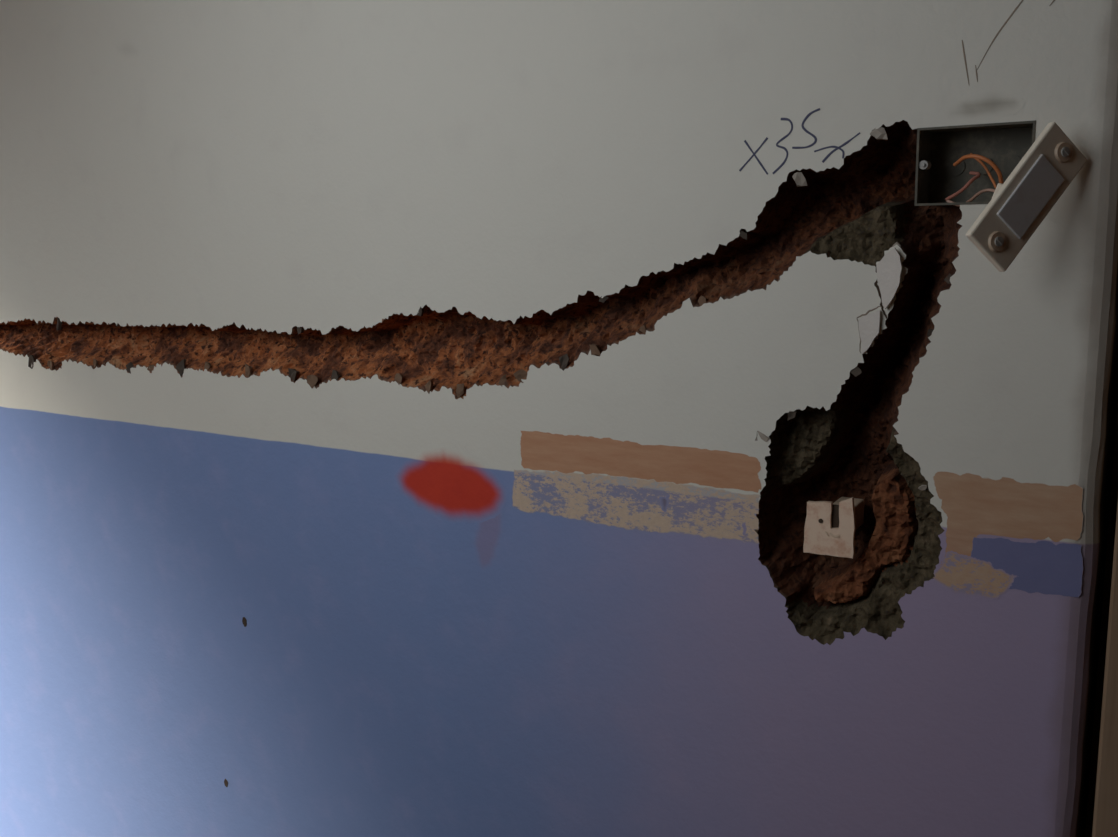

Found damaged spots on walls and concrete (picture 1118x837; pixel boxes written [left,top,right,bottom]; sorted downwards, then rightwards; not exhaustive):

crack [857,248,902,354]
spalling [512,403,1084,645]